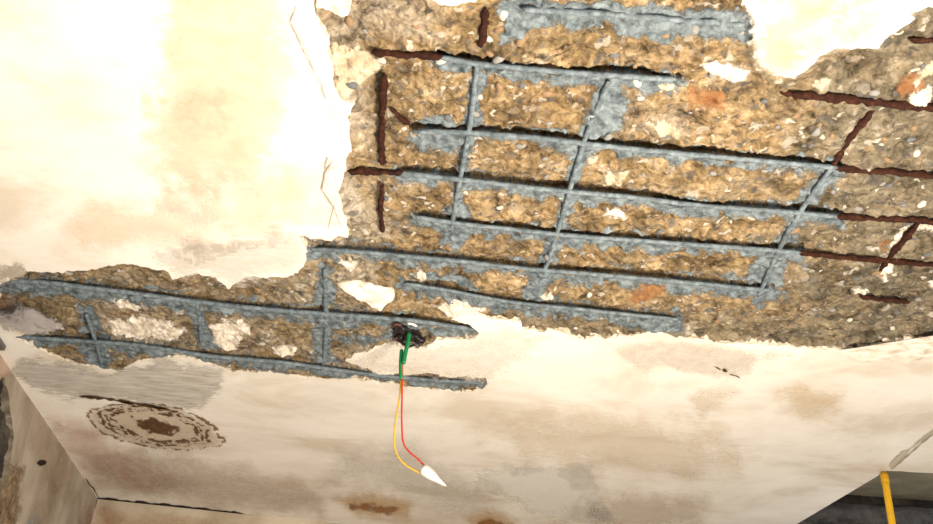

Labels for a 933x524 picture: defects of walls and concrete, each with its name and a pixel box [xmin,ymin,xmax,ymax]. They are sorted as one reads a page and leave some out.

corrosion [371,49,443,61]
leakage [149,0,292,194]
corrosion [831,110,933,179]
corrosion [347,167,403,176]
spalling [0,0,933,411]
corrosion [837,212,933,225]
corrosion [799,250,933,267]
leakage [86,403,226,451]
corrosion [345,496,408,515]
corrosion [469,514,510,524]